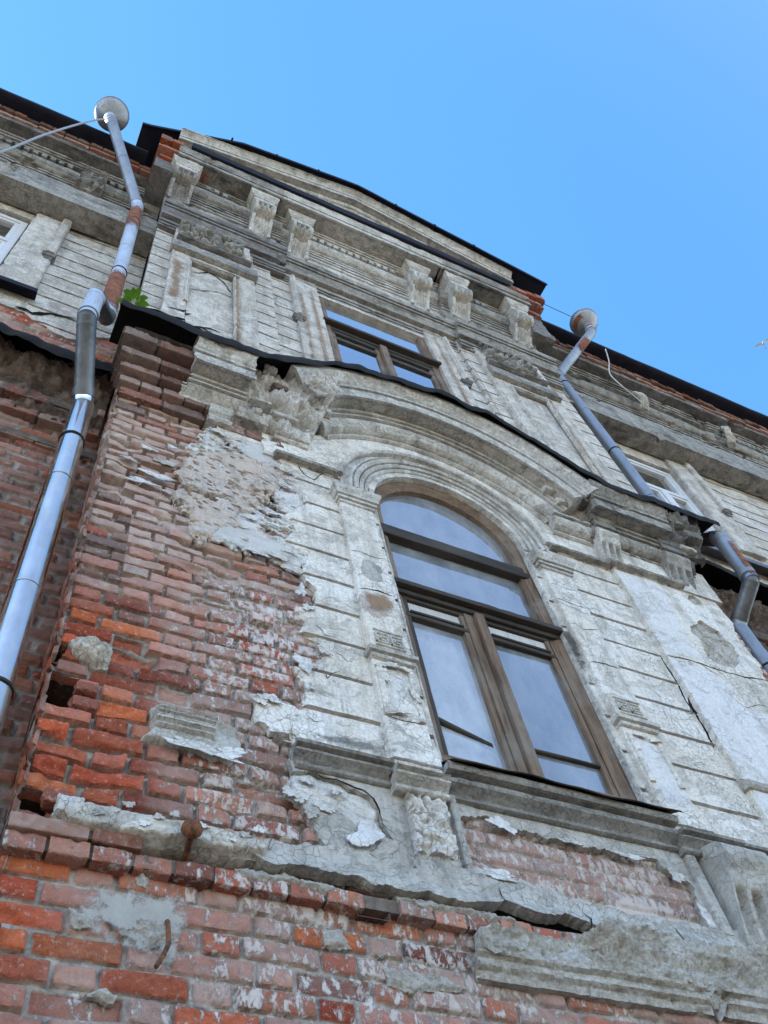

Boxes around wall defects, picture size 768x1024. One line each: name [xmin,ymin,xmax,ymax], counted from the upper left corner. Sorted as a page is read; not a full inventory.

corrosion [126,205,142,228]
corrosion [104,270,126,309]
flaking render [0,389,399,860]
peeling [616,570,768,815]
crack [661,655,767,748]
crack [317,774,391,831]
flaking render [461,816,718,929]
flaking render [0,855,739,1024]